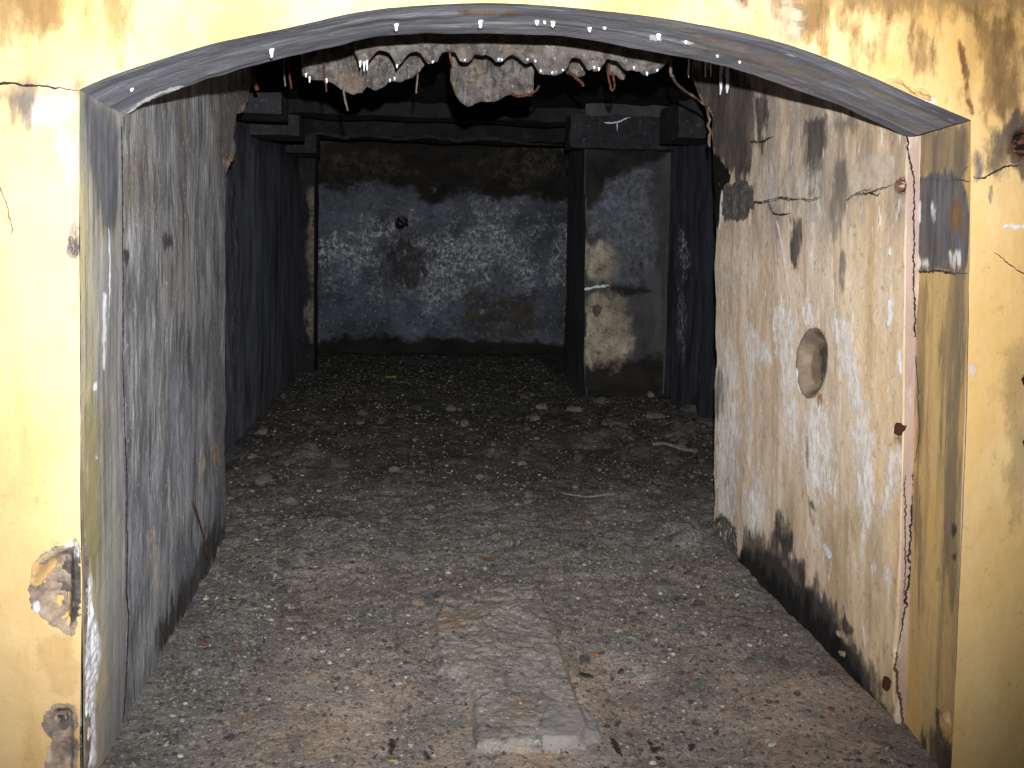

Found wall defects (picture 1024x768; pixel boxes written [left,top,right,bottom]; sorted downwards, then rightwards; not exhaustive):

leakage [683,0,827,43]
crack [0,81,76,91]
spalling [301,33,670,107]
rust [669,55,712,147]
leakage [756,97,769,153]
rust [895,178,907,193]
crack [958,165,1017,182]
leakage [918,129,982,348]
crack [846,136,968,724]
rust [191,500,208,559]
spalling [28,538,81,636]
spalling [42,703,80,768]